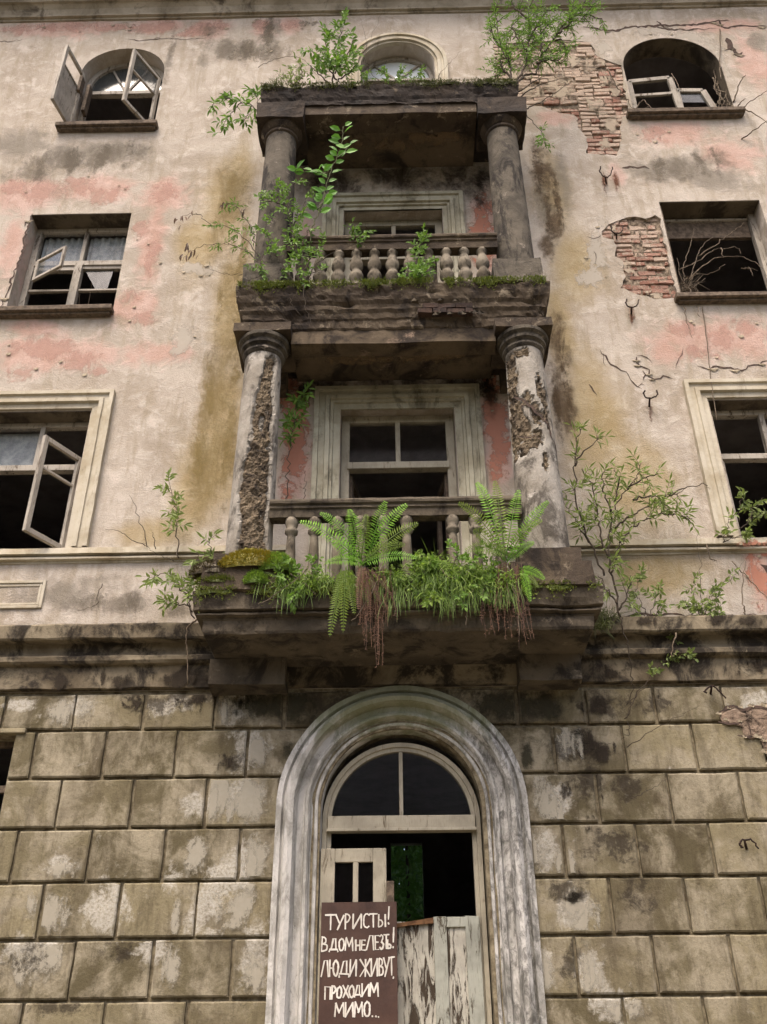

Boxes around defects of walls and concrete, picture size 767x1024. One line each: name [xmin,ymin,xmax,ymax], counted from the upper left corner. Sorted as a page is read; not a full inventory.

crack [588,20,765,57]
spalling [493,40,628,156]
spalling [575,215,676,299]
spalling [239,358,311,551]
spalling [482,348,550,485]
crack [589,350,767,395]
spalling [716,702,767,764]
leakage [208,754,266,822]
leakage [522,744,571,819]
leakage [217,838,270,929]
leakage [532,836,600,930]
leakage [13,895,70,985]